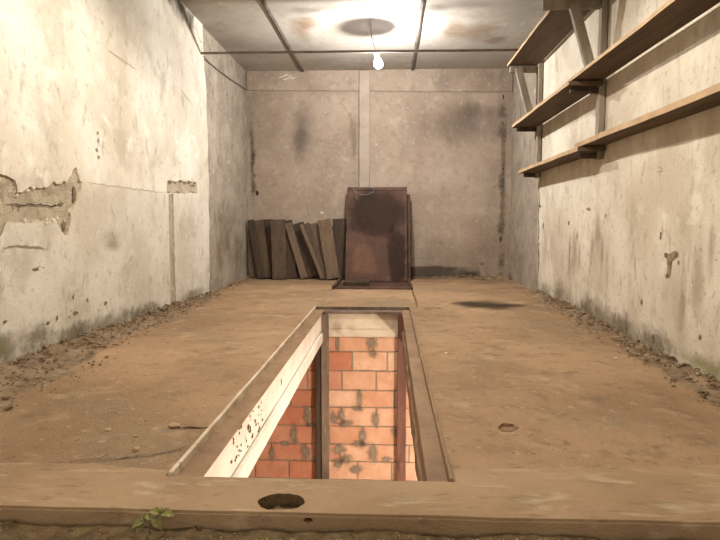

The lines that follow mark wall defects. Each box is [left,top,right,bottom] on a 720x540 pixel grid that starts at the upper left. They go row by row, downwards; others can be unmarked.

flaking render [0,166,82,237]
spalling [169,180,197,303]
flaking render [664,251,679,278]